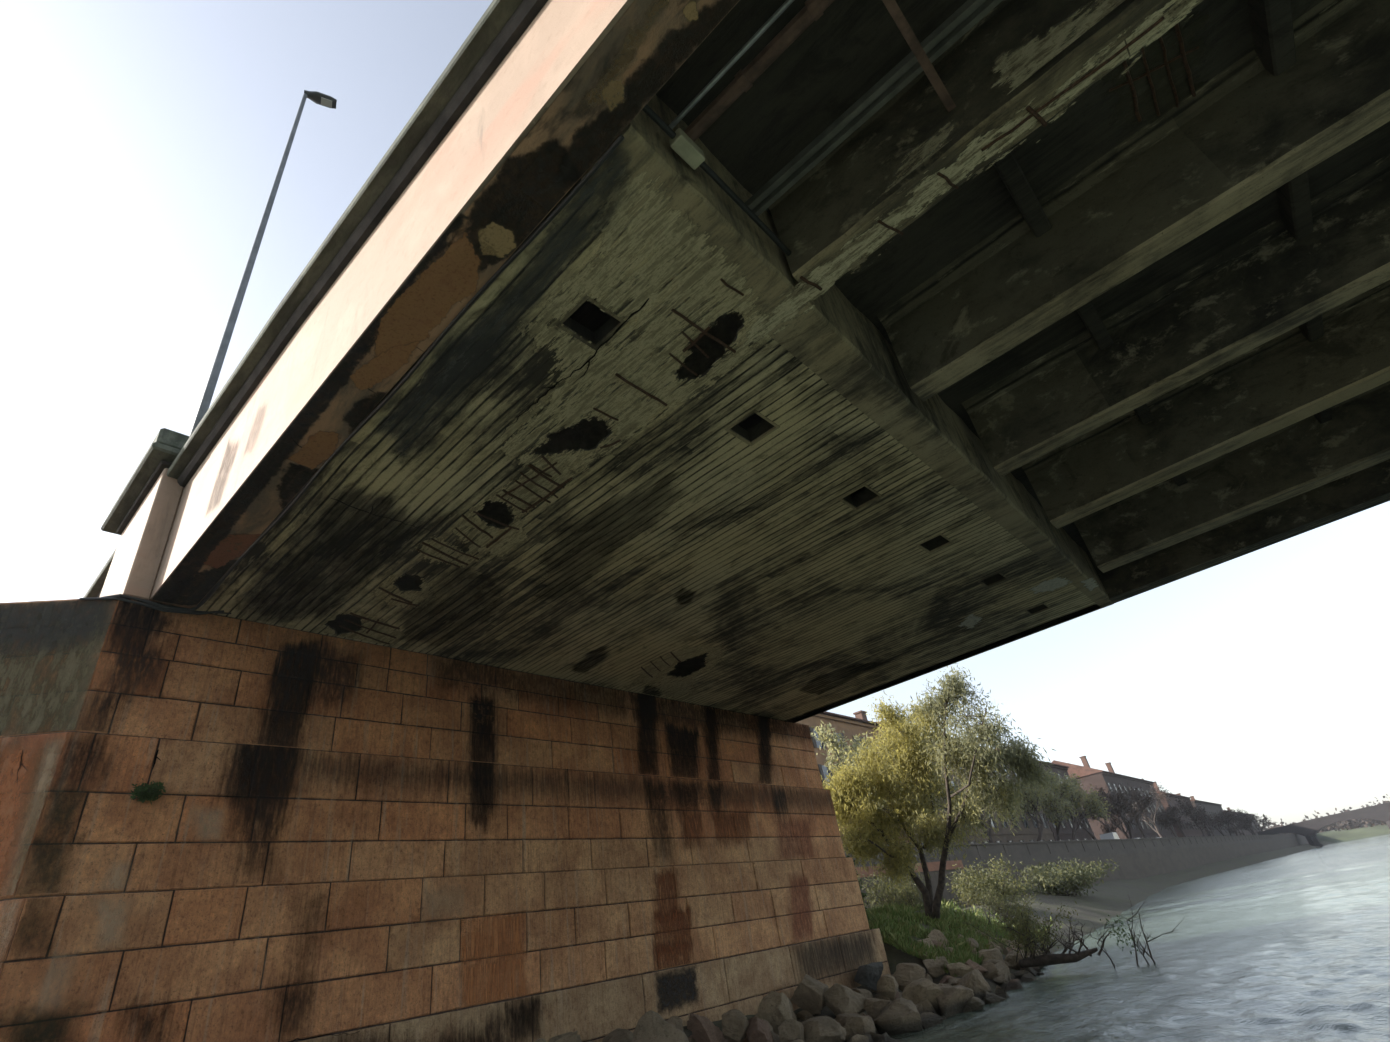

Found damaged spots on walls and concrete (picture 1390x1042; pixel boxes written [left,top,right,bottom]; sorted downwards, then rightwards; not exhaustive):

spalling [325,0,1198,645]
damp [227,569,833,870]
damp [656,967,698,1012]